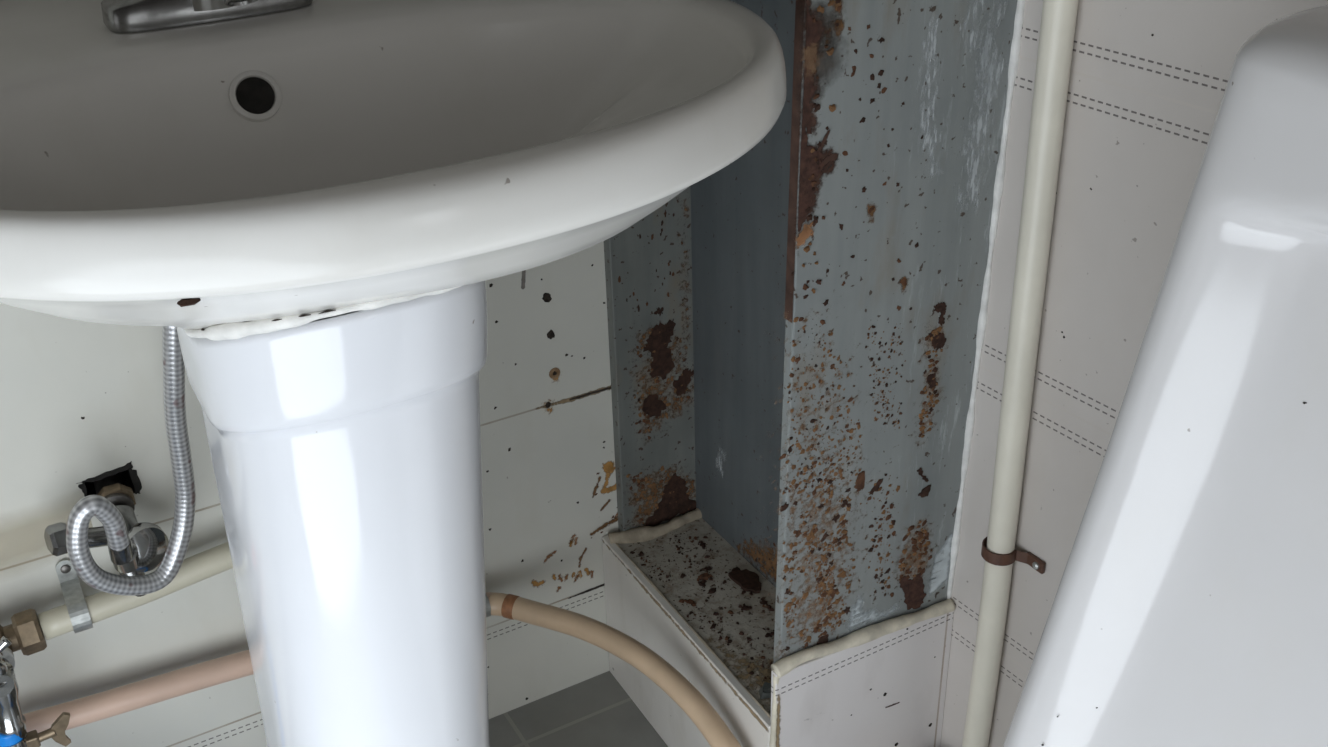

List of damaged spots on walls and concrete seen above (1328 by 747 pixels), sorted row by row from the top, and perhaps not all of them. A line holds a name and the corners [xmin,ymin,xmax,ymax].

corrosion [626,241,694,440]
corrosion [728,0,947,656]
corrosion [531,461,781,747]